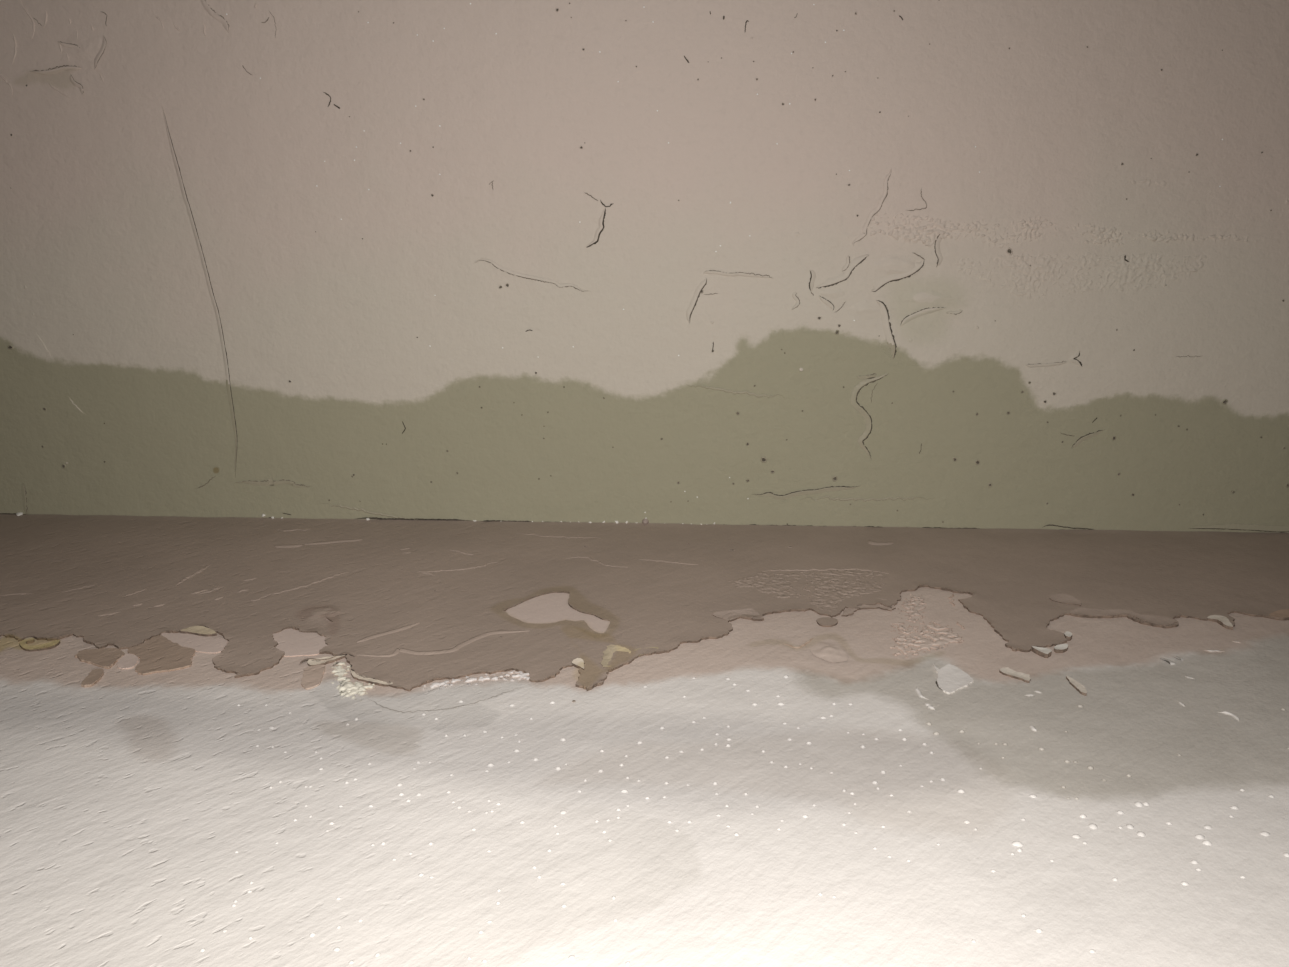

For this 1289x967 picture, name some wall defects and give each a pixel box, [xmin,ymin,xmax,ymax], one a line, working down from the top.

crack [584,192,614,248]
crack [475,258,589,292]
crack [161,105,531,548]
crack [686,170,963,526]
peeling [161,626,228,653]
peeling [273,628,393,687]
peeling [572,658,584,670]
peeling [506,593,658,668]
leakage [0,514,1289,701]
peeling [933,664,973,694]
peeling [1031,594,1177,658]
peeling [1207,615,1233,630]